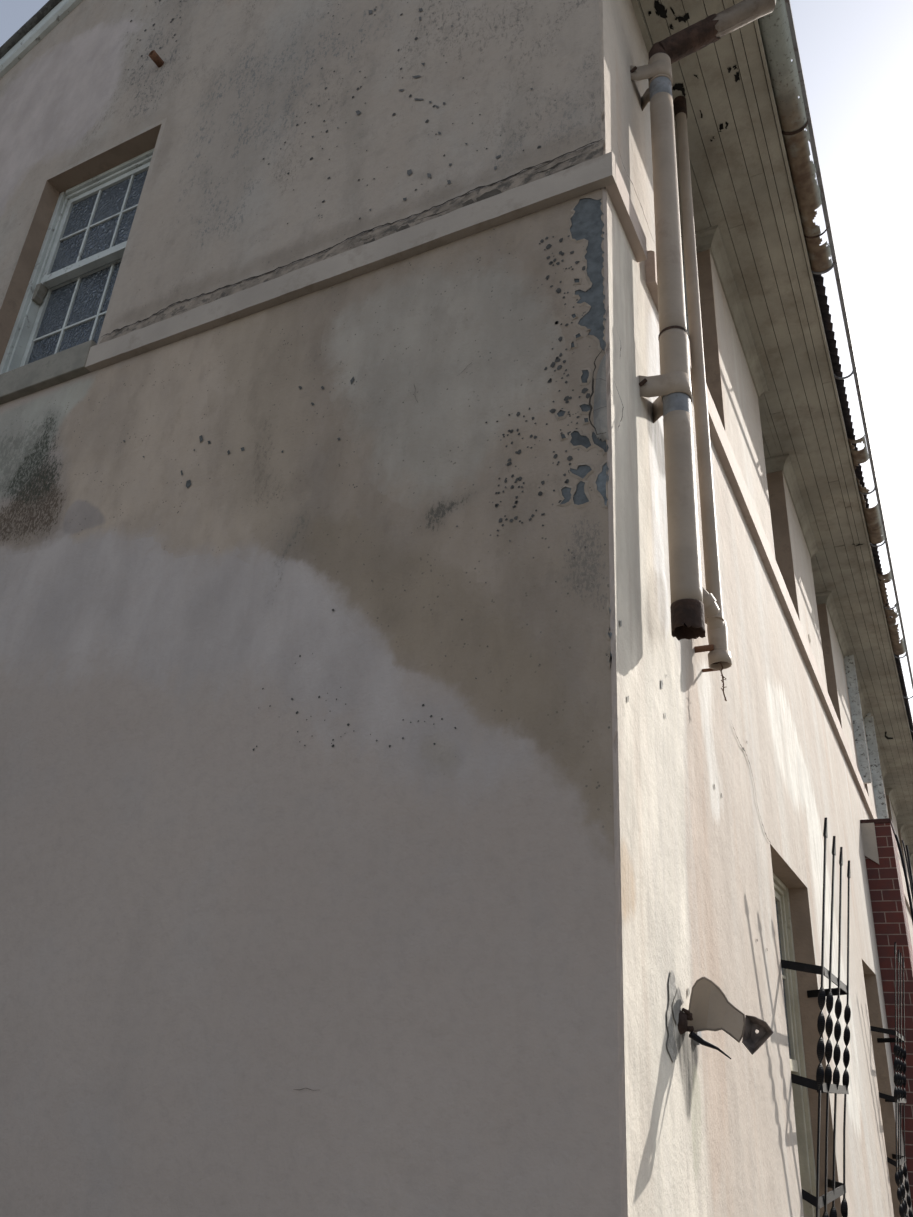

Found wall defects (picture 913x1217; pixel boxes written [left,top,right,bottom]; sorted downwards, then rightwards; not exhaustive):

flaking render [99,140,604,344]
crack [103,139,653,336]
peeling [485,197,609,541]
damp [0,188,638,935]